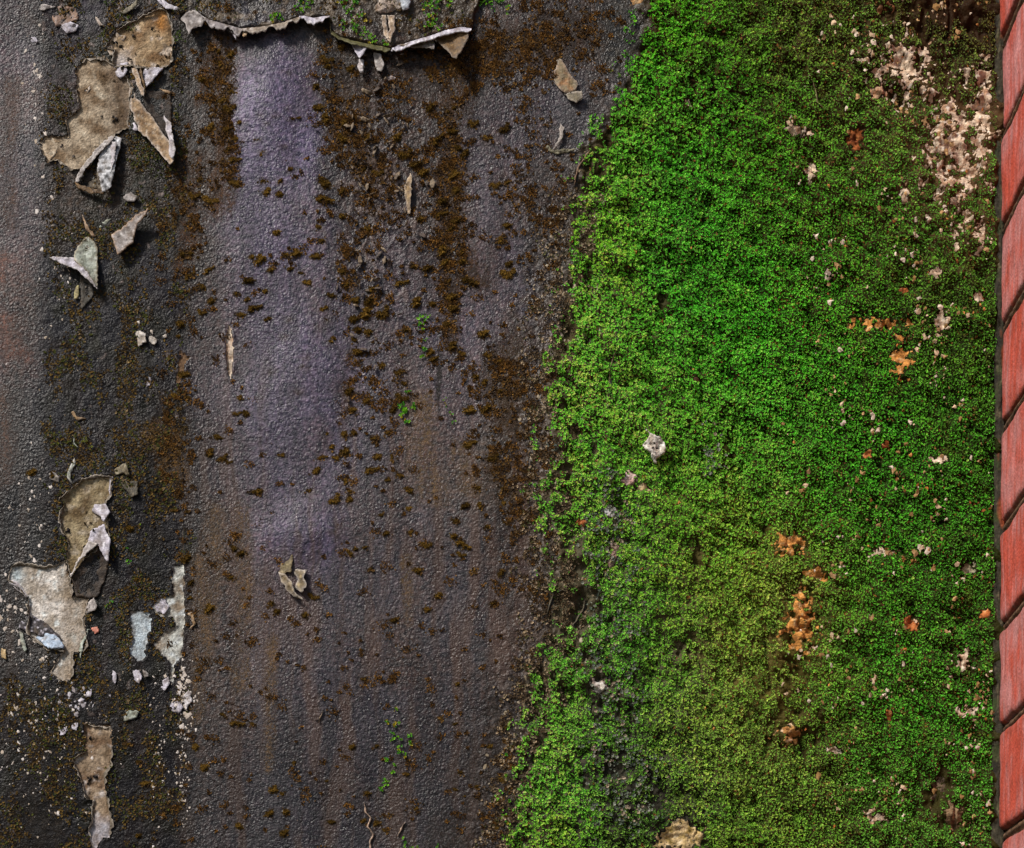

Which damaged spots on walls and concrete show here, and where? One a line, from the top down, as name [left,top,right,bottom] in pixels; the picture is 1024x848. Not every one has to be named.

peeling [39,0,471,194]
water stain [325,7,598,103]
peeling [49,192,148,309]
peeling [6,440,138,682]
peeling [127,565,196,691]
peeling [278,555,307,600]
peeling [124,710,139,721]
peeling [170,690,192,713]
peeling [60,722,114,848]